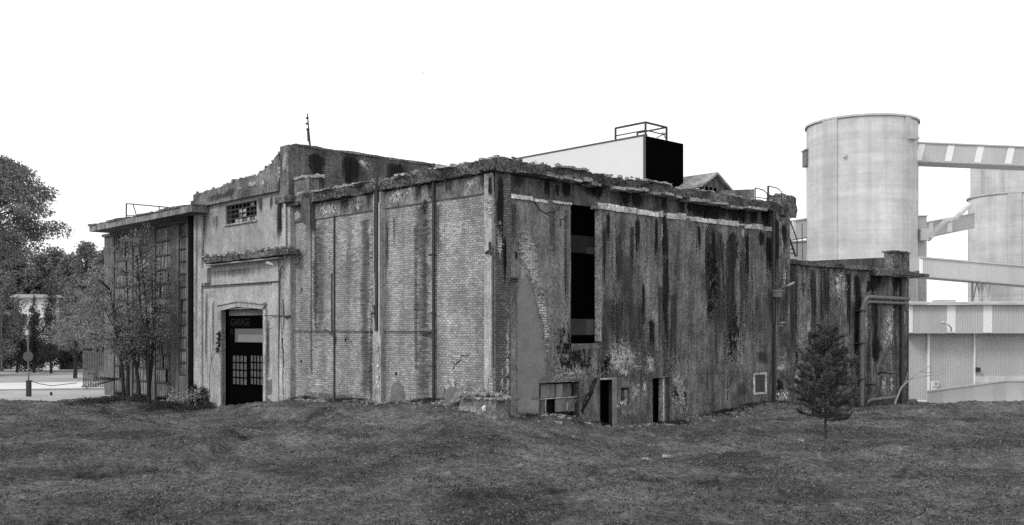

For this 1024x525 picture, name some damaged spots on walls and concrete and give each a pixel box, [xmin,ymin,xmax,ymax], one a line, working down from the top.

leakage [309,153,325,188]
leakage [342,156,360,184]
leakage [386,162,406,179]
leakage [313,194,394,401]
leakage [414,183,462,392]
peeling [517,227,654,410]
leakage [604,199,677,356]
leakage [680,201,827,358]
leakage [847,273,899,374]